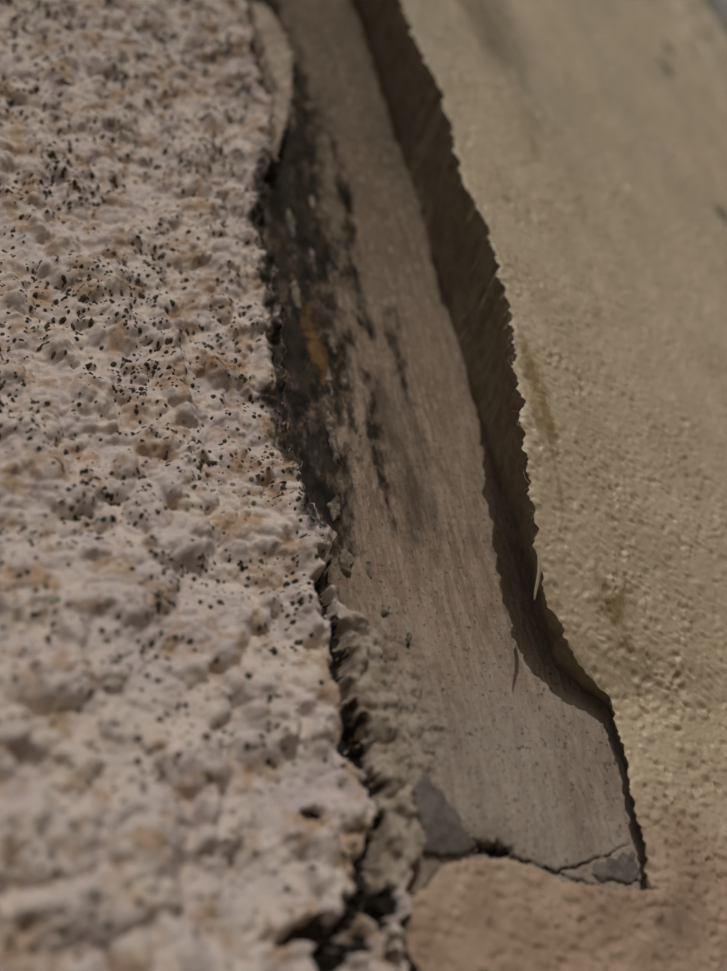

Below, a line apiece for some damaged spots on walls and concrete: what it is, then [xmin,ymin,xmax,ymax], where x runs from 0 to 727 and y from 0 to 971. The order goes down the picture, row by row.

damp [0,0,408,558]
spalling [243,0,652,897]
damp [0,523,61,645]
damp [135,526,318,666]
damp [131,725,182,795]
damp [98,614,236,755]
damp [244,721,283,776]
crack [275,558,402,962]
crack [475,840,627,886]
spalling [398,912,421,971]